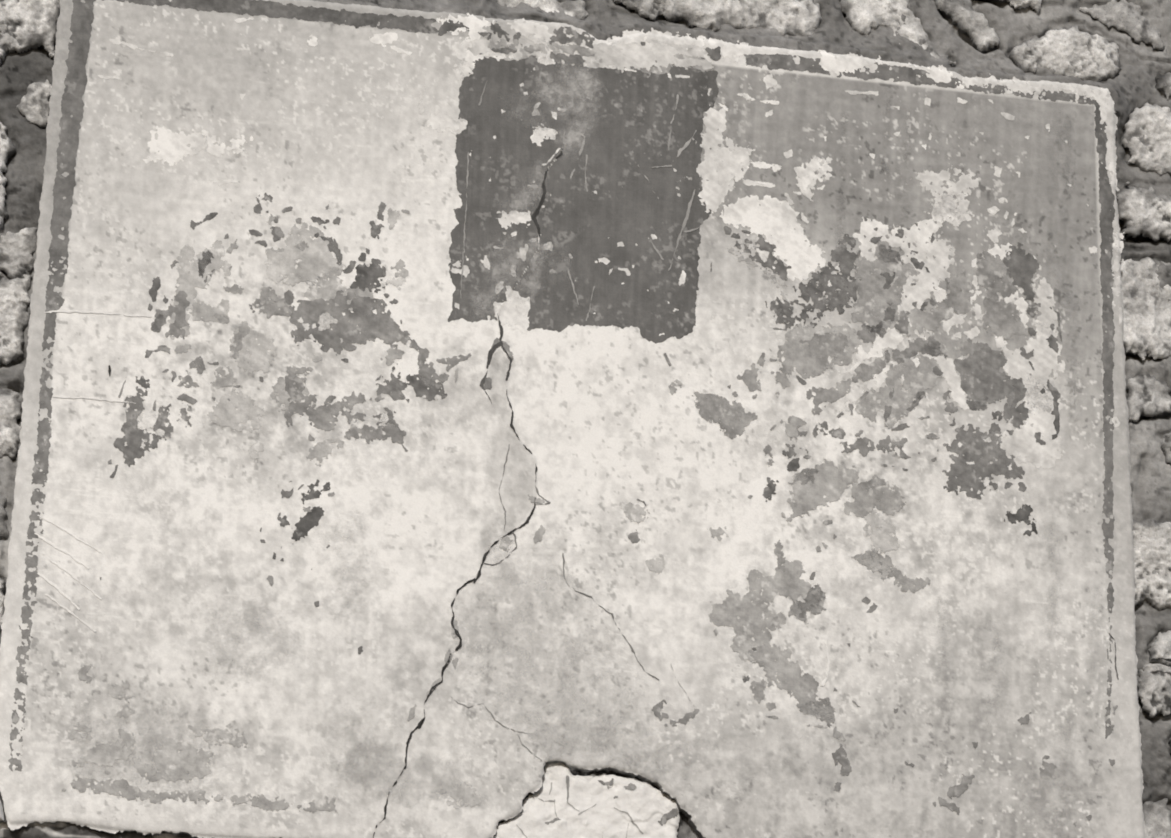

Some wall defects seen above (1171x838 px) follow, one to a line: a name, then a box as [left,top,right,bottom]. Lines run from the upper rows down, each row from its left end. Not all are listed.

peeling [520,83,566,166]
peeling [436,13,758,81]
peeling [818,50,882,76]
peeling [897,62,1119,191]
crack [531,150,563,237]
peeling [449,205,553,334]
peeling [108,193,472,544]
peeling [668,88,1078,593]
crack [373,316,691,837]
peeling [709,540,852,791]
peeling [62,680,338,813]
flaking render [493,762,680,838]